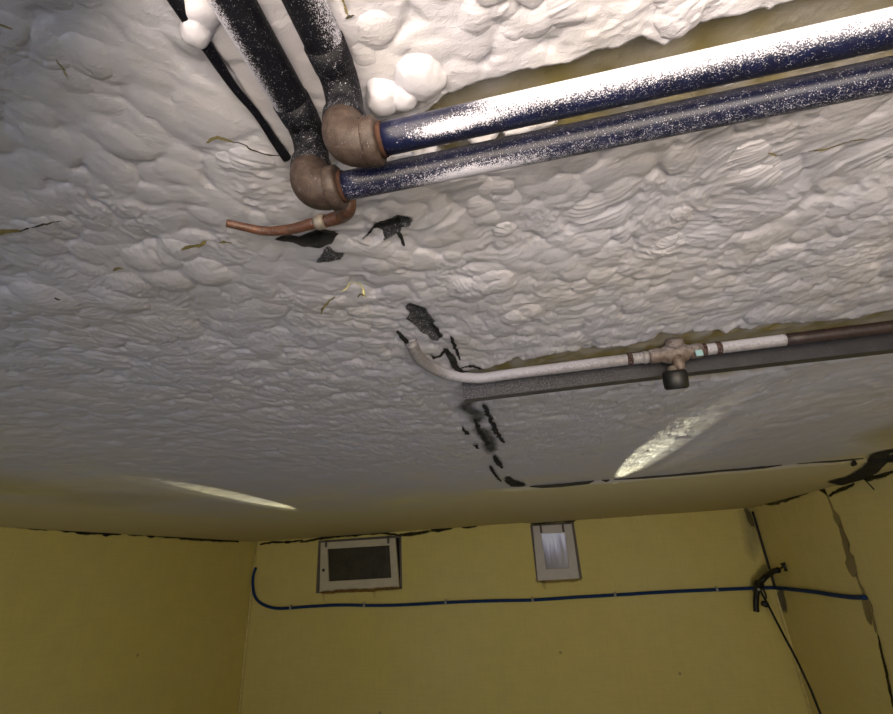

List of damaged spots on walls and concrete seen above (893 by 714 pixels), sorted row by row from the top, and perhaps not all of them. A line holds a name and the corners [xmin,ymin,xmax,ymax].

peeling [316,246,344,263]
crack [461,402,893,497]
crack [867,599,893,707]